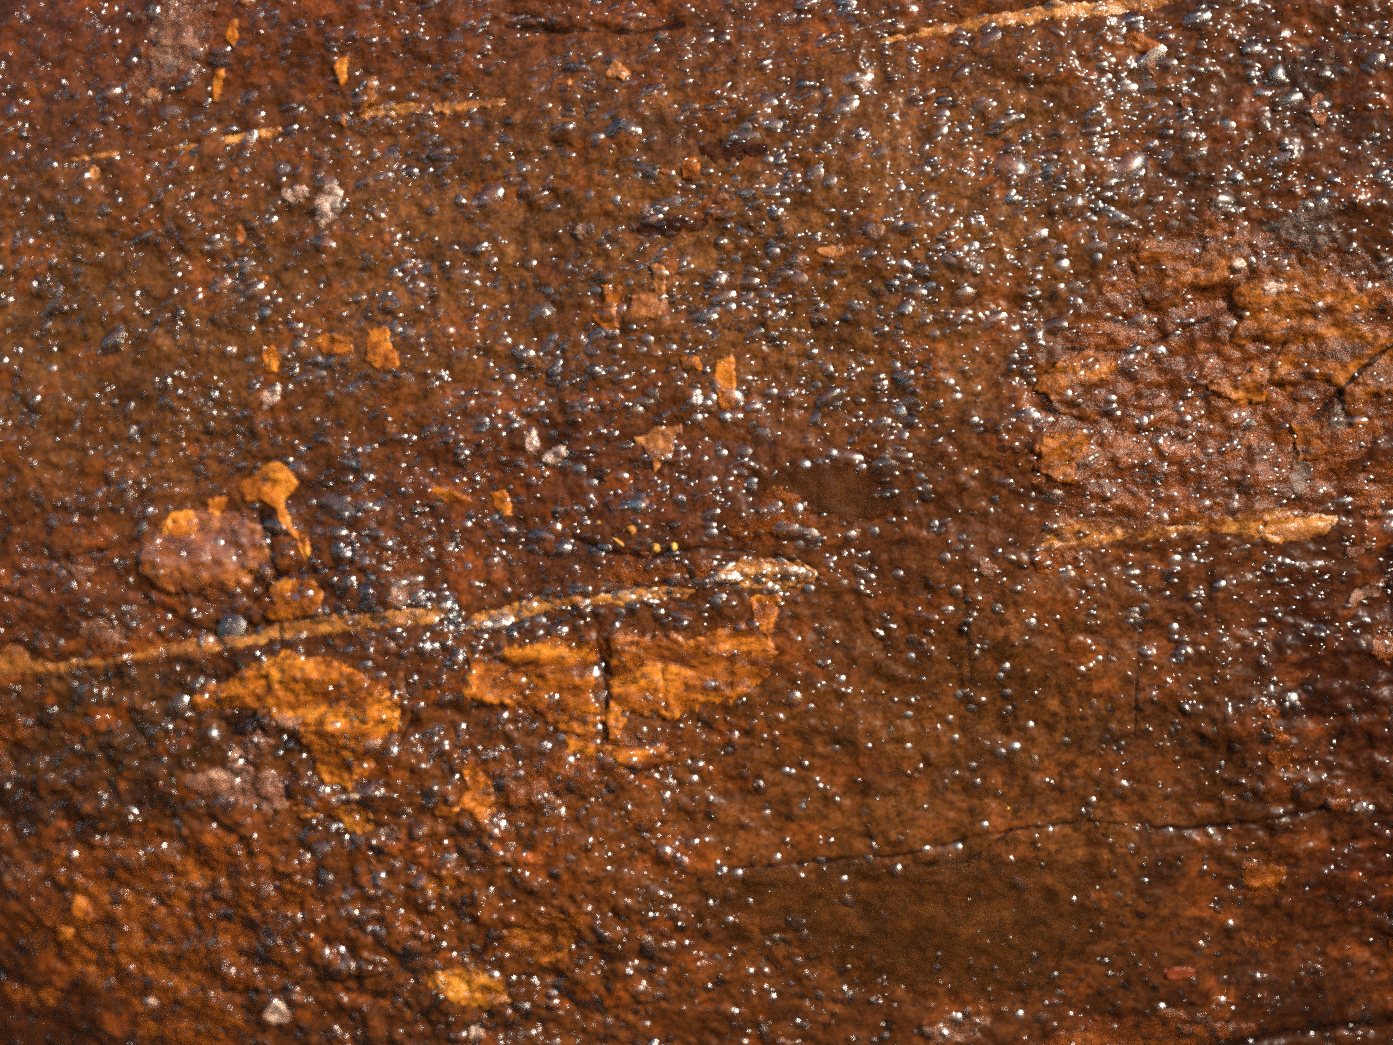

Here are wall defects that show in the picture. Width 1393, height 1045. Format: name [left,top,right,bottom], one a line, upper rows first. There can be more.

corrosion [382,524,460,579]
corrosion [606,552,720,590]
corrosion [460,729,683,831]